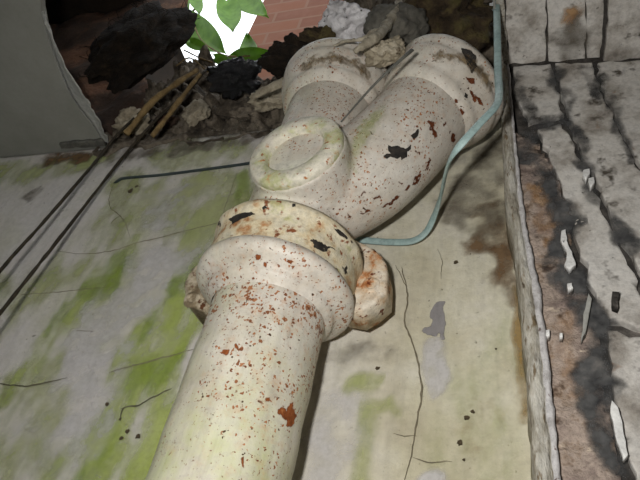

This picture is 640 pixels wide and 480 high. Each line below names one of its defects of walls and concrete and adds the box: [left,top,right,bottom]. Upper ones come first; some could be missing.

peeling [384,129,419,160]
water stain [467,219,516,286]
peeling [515,132,628,480]
crack [394,267,452,480]
water stain [513,311,523,377]
rust [277,402,297,427]